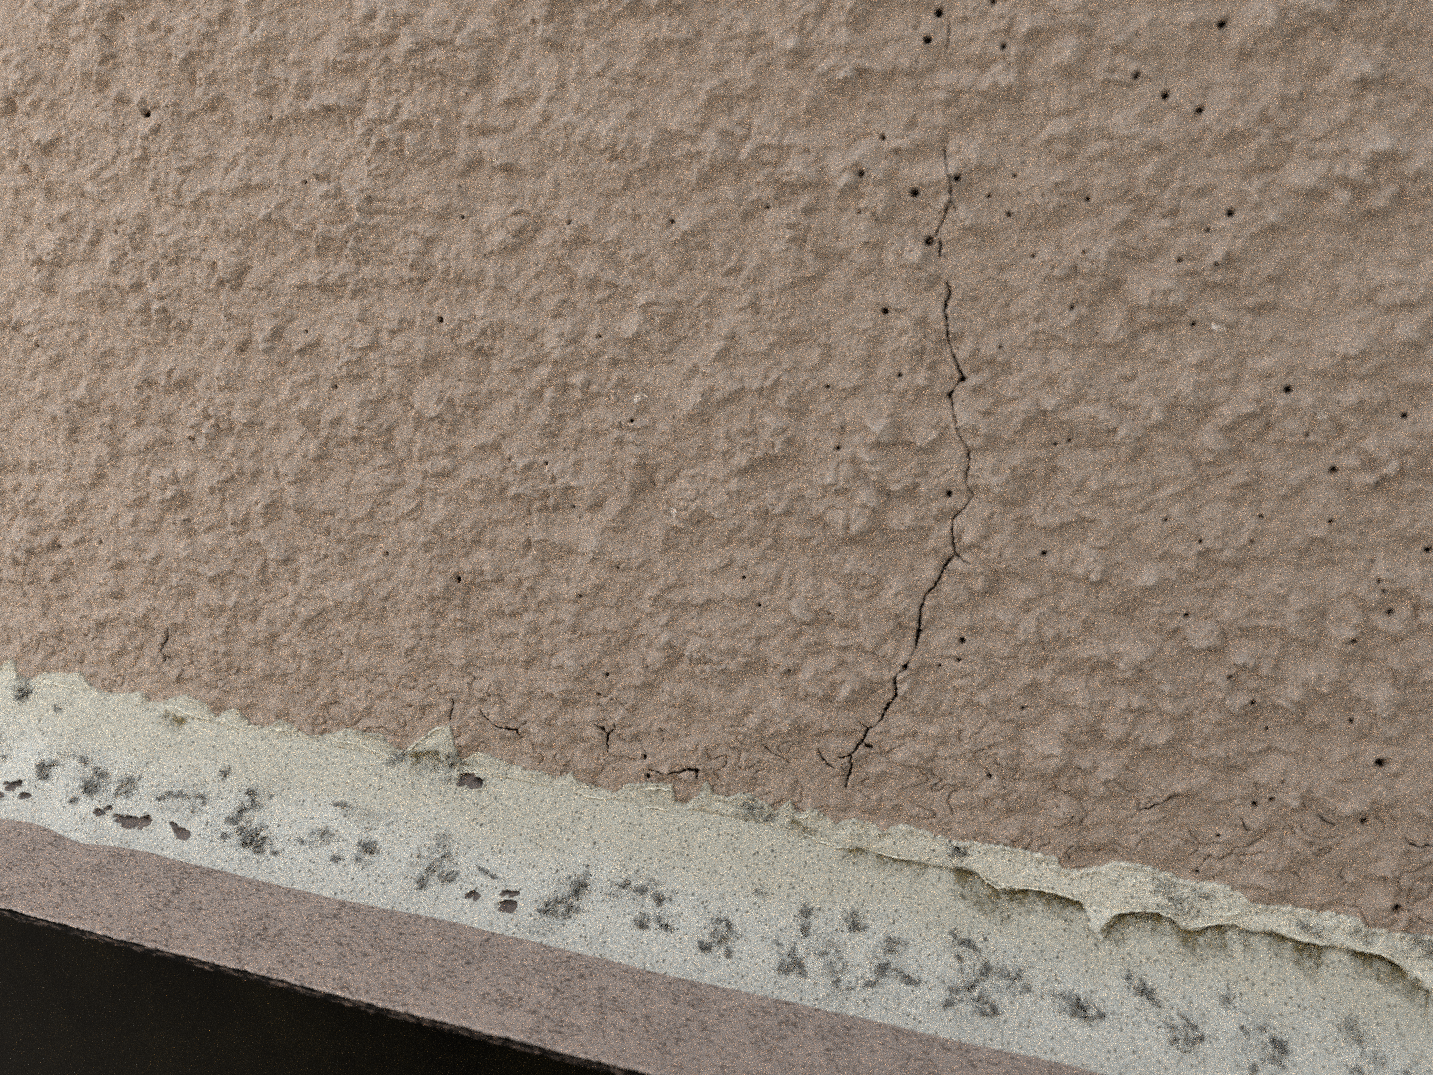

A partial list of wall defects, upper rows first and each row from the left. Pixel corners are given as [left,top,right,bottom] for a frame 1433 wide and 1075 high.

crack [764,148,974,788]
peeling [789,800,919,860]
leakage [848,848,926,869]
leakage [954,867,1083,919]
peeling [973,866,1088,908]
leakage [1101,911,1226,950]
peeling [1105,910,1251,930]
leakage [1266,932,1321,965]
leakage [1351,950,1429,1006]
peeling [1351,948,1433,991]